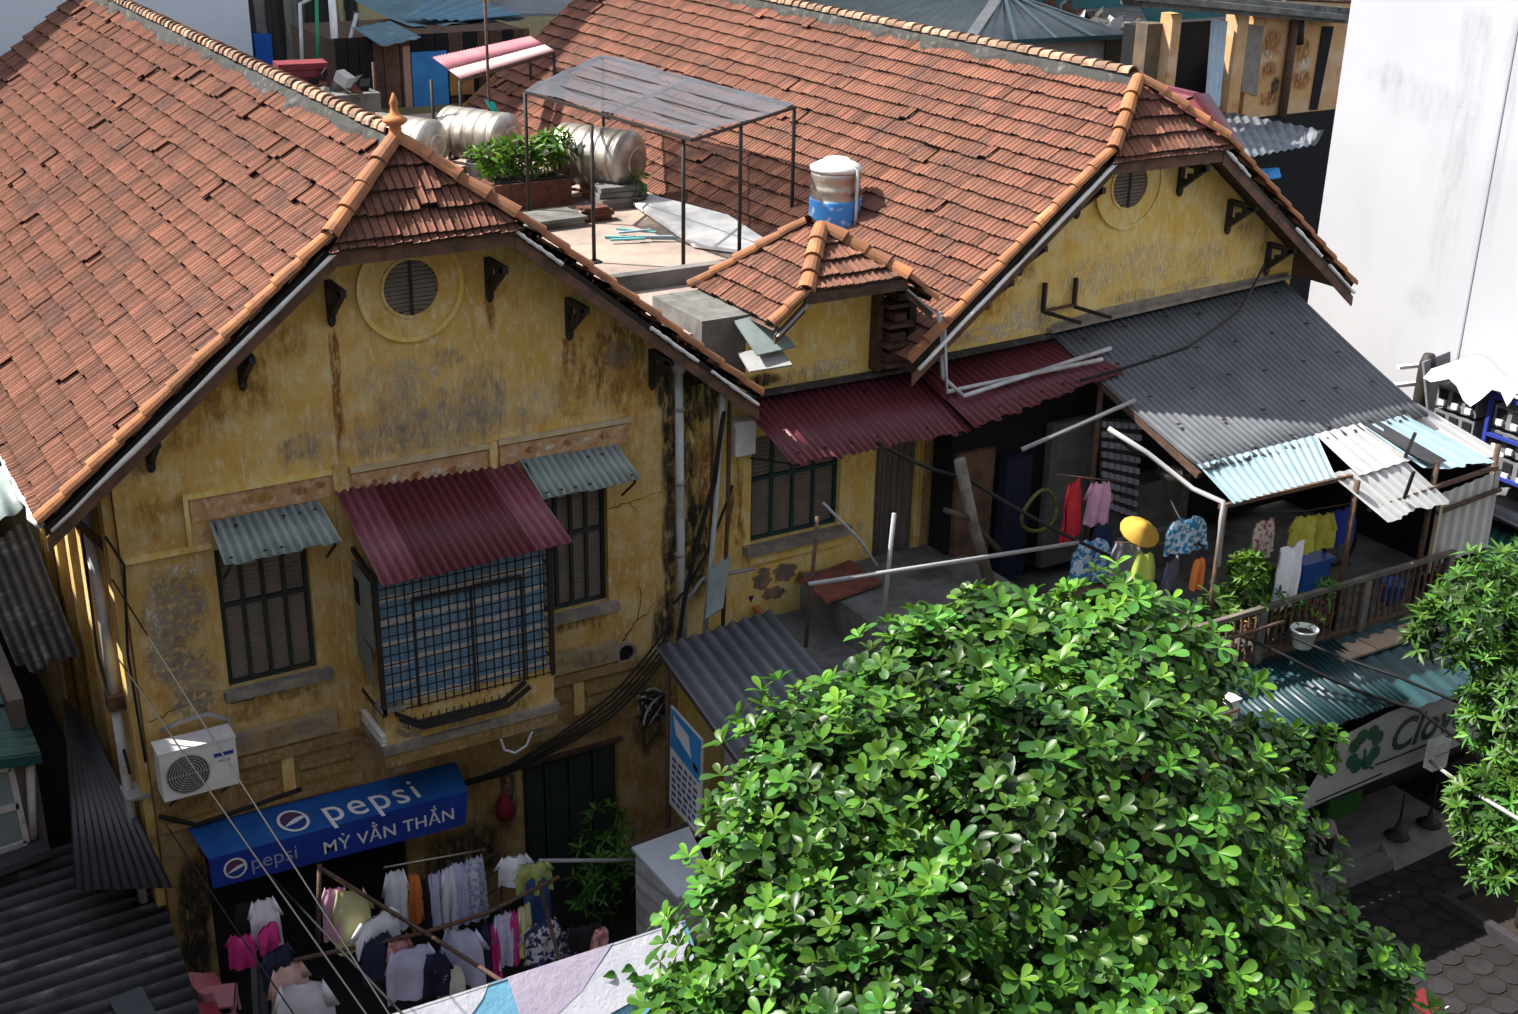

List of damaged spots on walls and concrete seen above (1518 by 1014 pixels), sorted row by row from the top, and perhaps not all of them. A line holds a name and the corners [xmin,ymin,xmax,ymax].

rust [329,333,342,445]
leakage [285,327,720,647]
flaking render [145,565,214,717]
spalling [752,563,807,600]